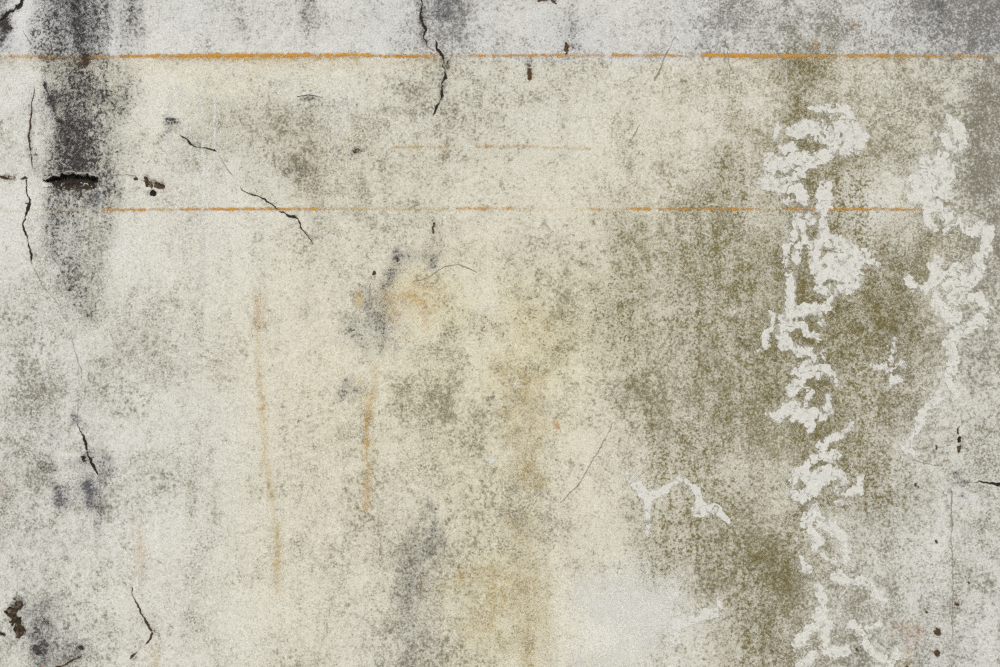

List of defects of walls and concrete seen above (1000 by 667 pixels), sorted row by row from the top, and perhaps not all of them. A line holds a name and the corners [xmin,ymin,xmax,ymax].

crack [0,0,32,45]
corrosion [120,52,436,61]
crack [416,0,449,115]
corrosion [647,39,941,58]
spalling [42,172,103,207]
leakage [27,0,144,323]
crack [180,135,312,243]
peeling [900,113,995,459]
peeling [756,102,907,667]
peeling [624,472,731,537]
spalling [0,597,26,638]
crack [130,587,162,659]